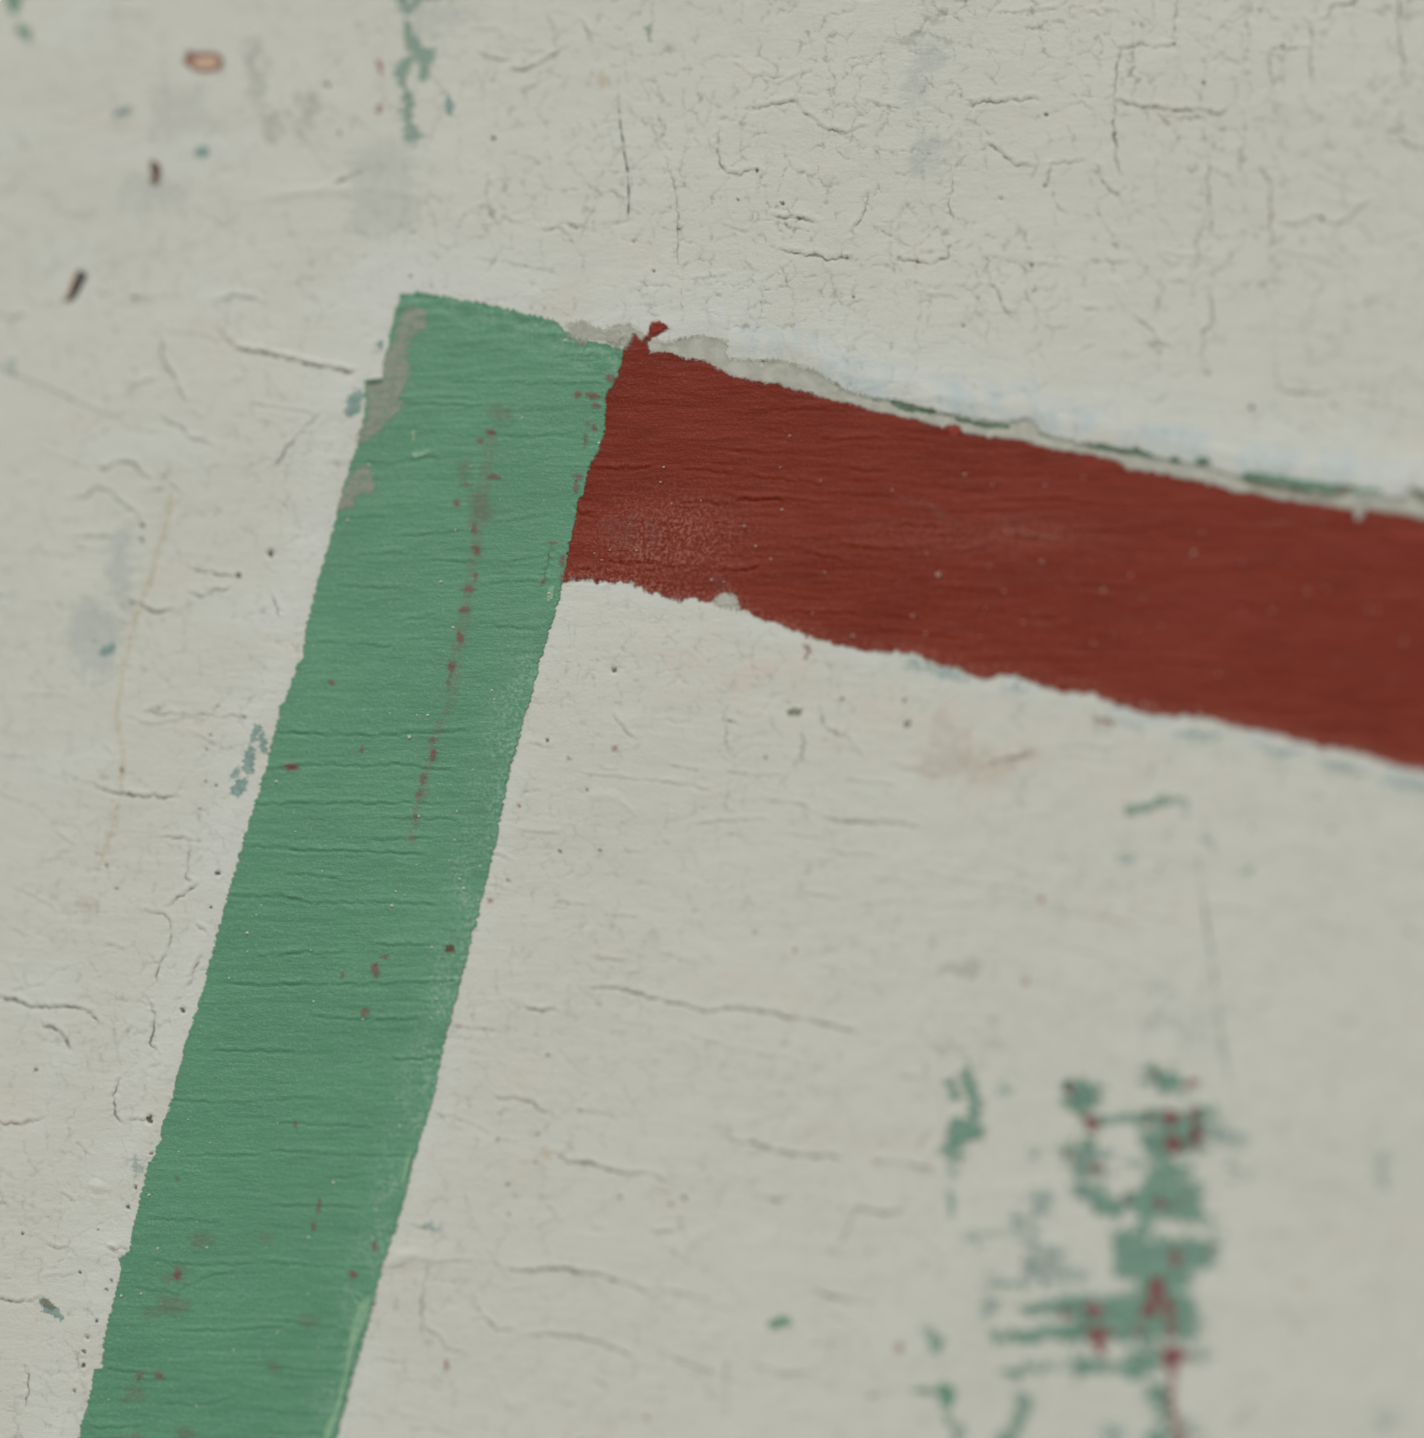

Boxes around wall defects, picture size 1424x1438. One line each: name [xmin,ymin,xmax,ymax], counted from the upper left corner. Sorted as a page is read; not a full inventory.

peeling [7,0,32,40]
peeling [395,0,435,143]
peeling [344,309,426,441]
peeling [891,401,935,414]
peeling [955,417,1009,429]
peeling [1086,444,1210,466]
peeling [339,468,374,510]
peeling [1244,471,1382,521]
peeling [937,1058,987,1164]
peeling [910,1381,967,1438]
peeling [998,1392,1033,1438]